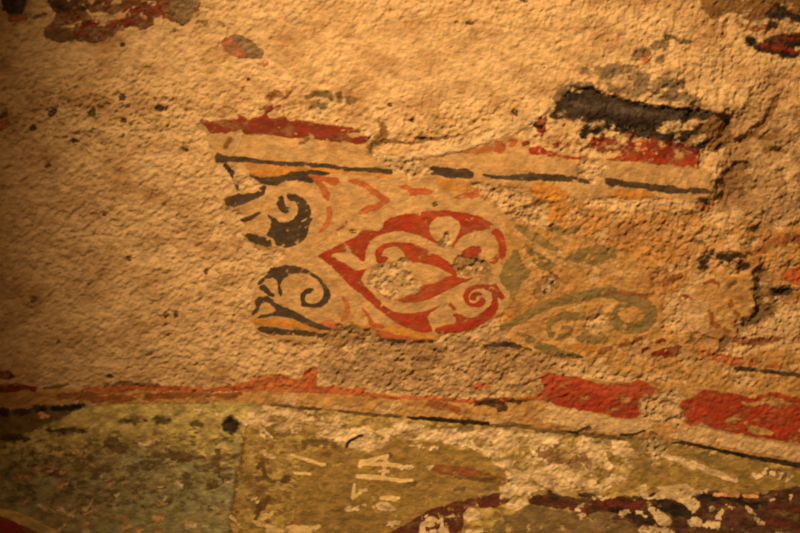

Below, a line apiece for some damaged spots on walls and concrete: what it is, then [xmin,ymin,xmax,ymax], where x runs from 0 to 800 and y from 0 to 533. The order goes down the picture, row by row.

peeling [660,119,681,138]
flaking render [367,257,423,300]
peeling [236,403,738,510]
peeling [752,468,794,482]
peeling [346,502,399,528]
peeling [419,508,483,533]
peeling [619,484,765,533]